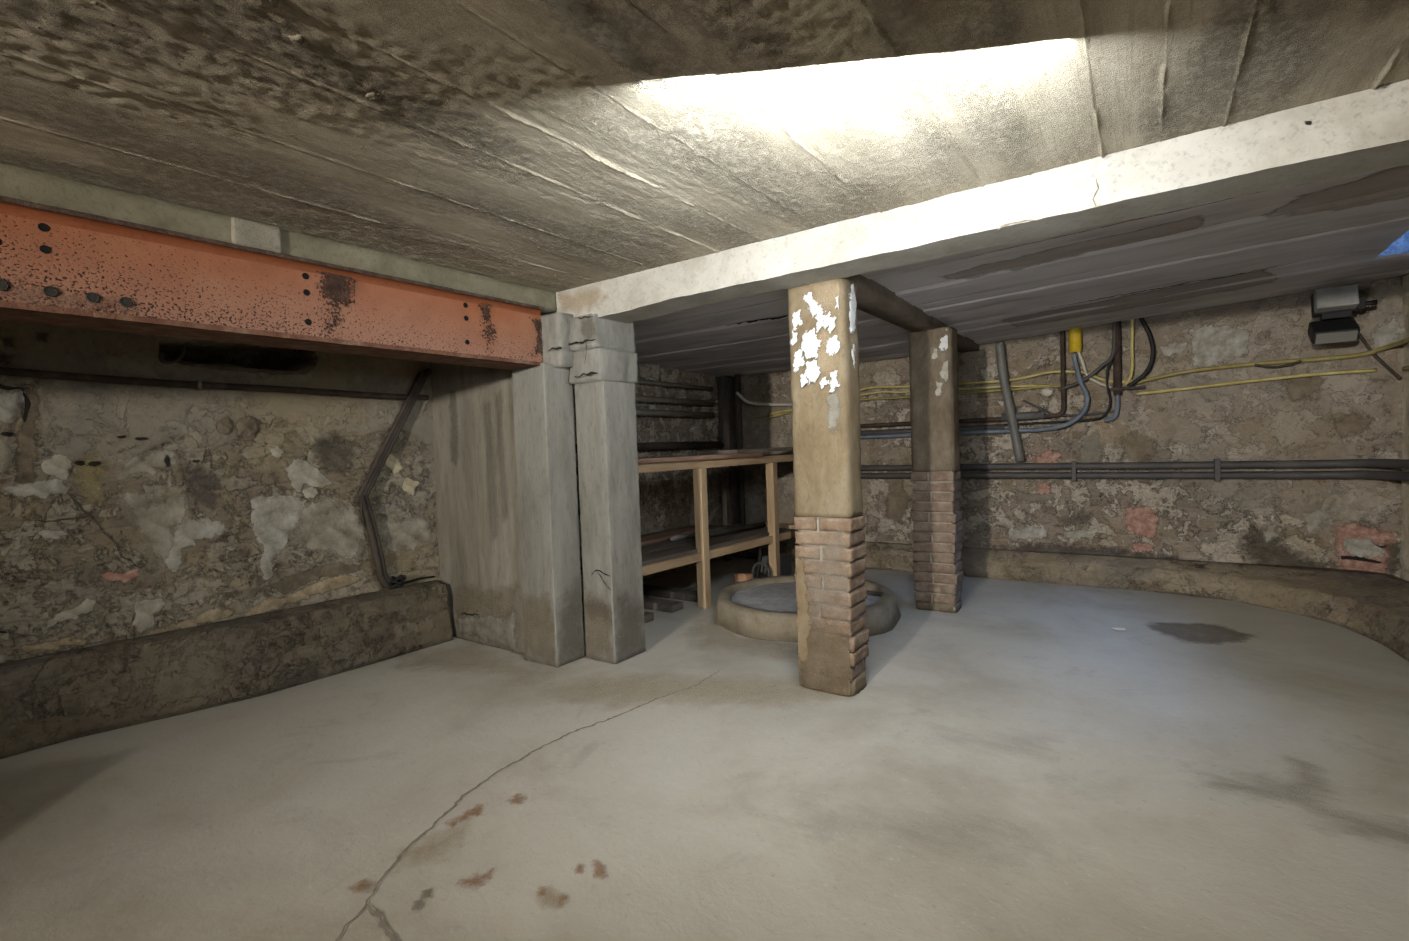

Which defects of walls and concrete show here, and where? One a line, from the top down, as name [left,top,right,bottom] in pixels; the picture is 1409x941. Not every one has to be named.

rust [315,271,357,338]
rust [478,302,499,356]
peeling [790,284,857,393]
peeling [931,329,948,396]
peeling [0,390,25,437]
peeling [4,478,68,499]
peeling [269,445,333,499]
peeling [385,454,419,496]
flaking render [1333,523,1400,575]
peeling [132,598,166,635]
damp [1151,623,1251,643]
crack [335,668,723,941]